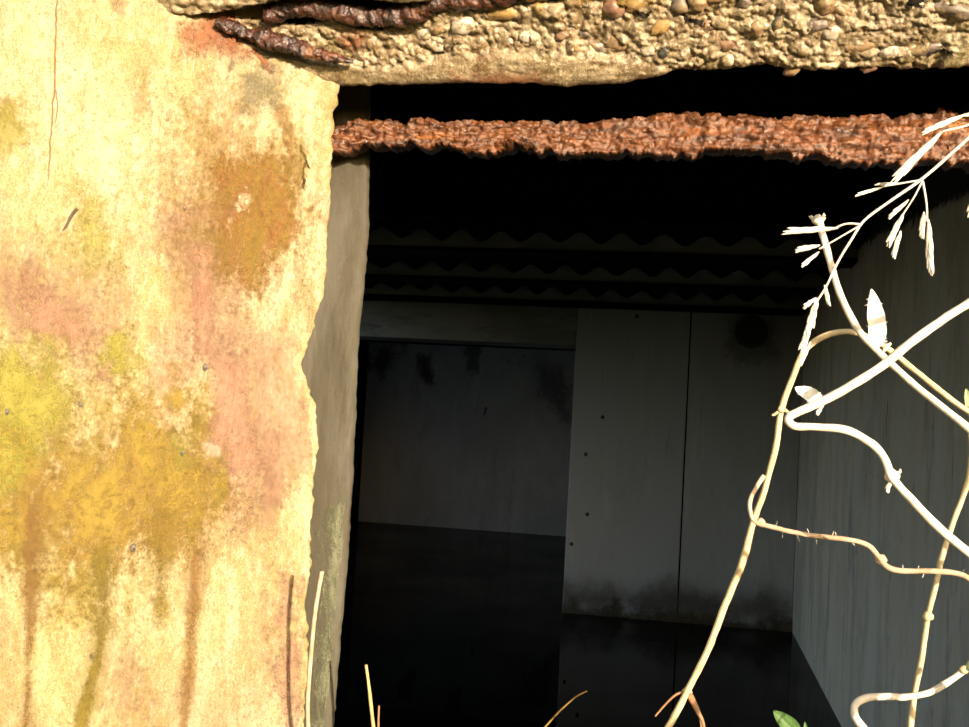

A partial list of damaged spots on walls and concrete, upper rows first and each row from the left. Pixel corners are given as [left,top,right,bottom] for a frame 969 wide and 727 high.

crack [48,0,58,180]
corrosion [178,10,365,74]
spalling [402,5,517,55]
spalling [555,26,628,54]
spalling [640,0,752,67]
spalling [783,51,801,77]
spalling [806,0,853,41]
spalling [844,39,944,74]
leakage [26,514,36,647]
leakage [154,584,167,618]
leakage [75,558,109,727]
leakage [183,550,200,727]